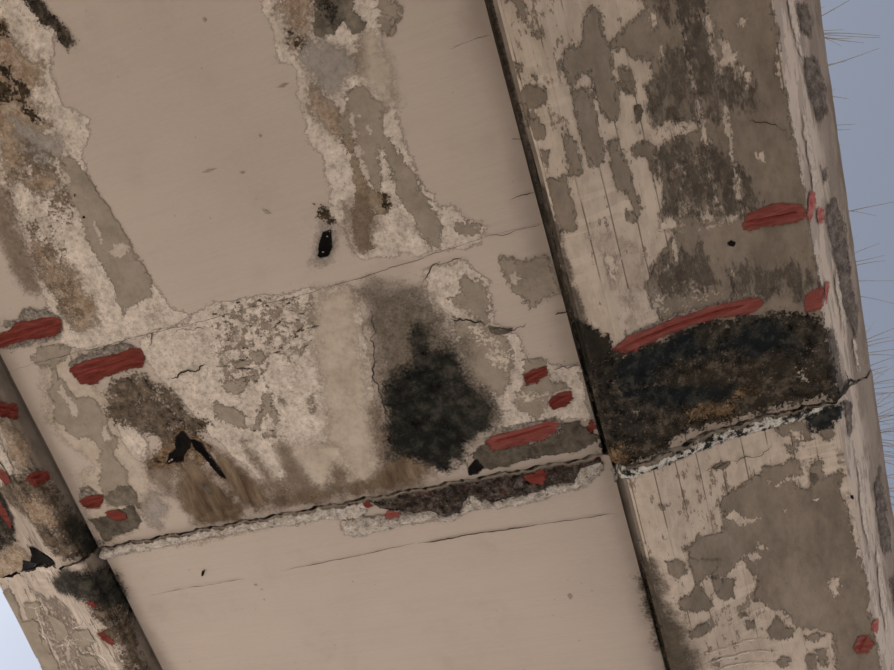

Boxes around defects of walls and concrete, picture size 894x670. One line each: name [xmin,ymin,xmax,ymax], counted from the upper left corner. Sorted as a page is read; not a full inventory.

peeling [338,83,485,255]
water stain [0,0,853,530]
peeling [546,0,860,371]
water stain [825,197,859,338]
peeling [0,307,146,542]
water stain [51,565,150,670]
peeling [211,295,319,443]
water stain [0,422,604,578]
peeling [363,273,603,519]
peeling [664,421,888,670]
crack [837,372,856,401]
water stain [874,467,892,555]